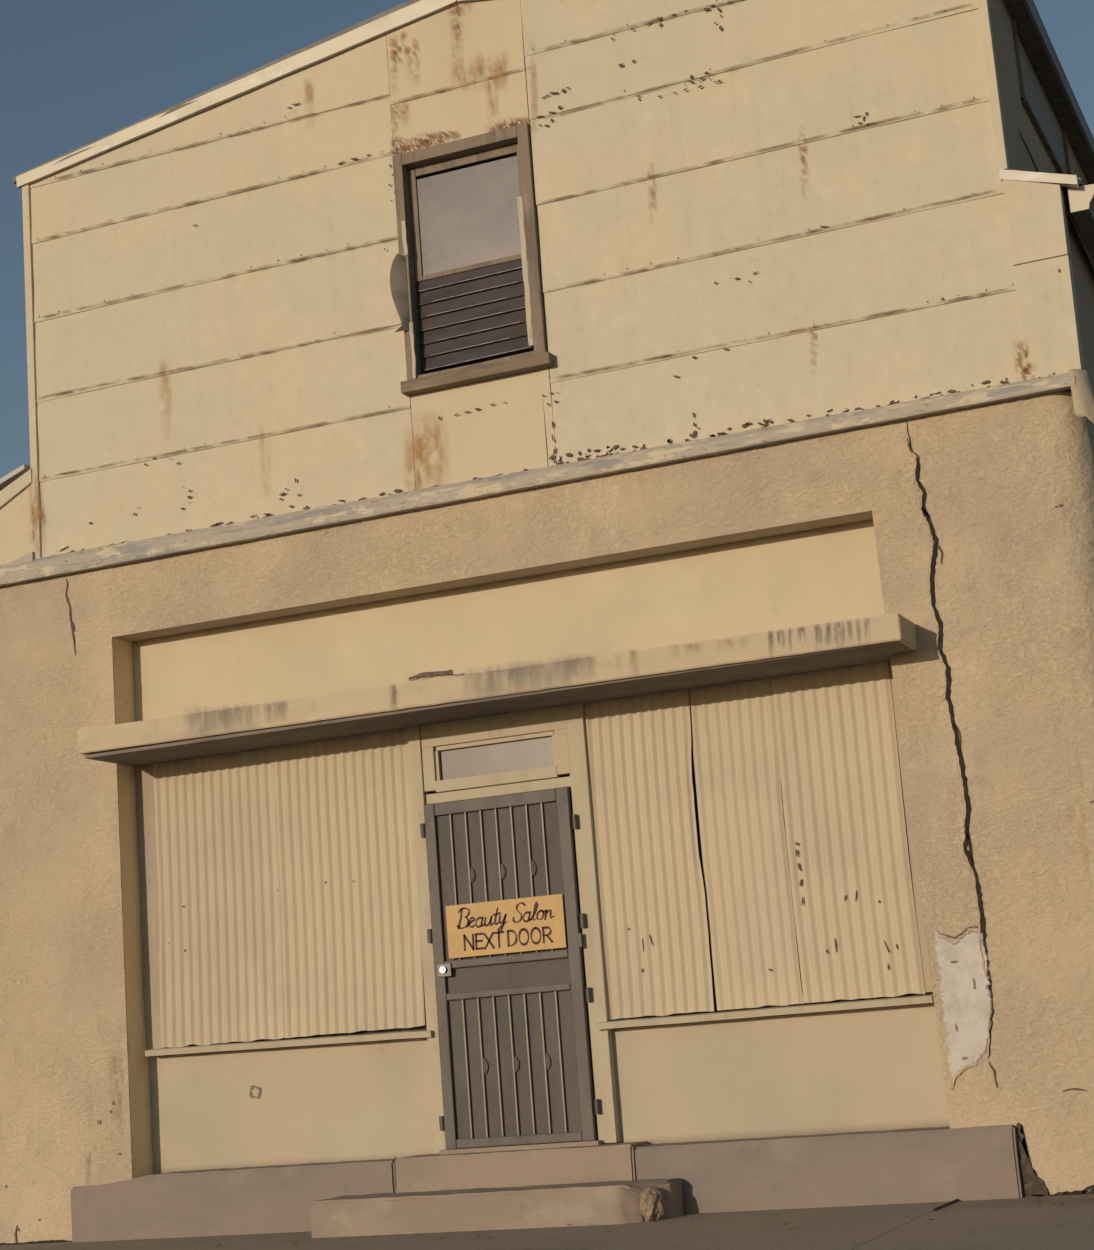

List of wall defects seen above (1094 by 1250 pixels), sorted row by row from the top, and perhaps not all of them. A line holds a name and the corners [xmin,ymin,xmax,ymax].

rust [392,132,458,153]
peeling [913,377,1009,399]
peeling [549,421,647,465]
peeling [667,412,810,443]
crack [65,579,76,655]
crack [904,420,998,1088]
spalling [934,928,992,1090]
spalling [639,1187,665,1222]